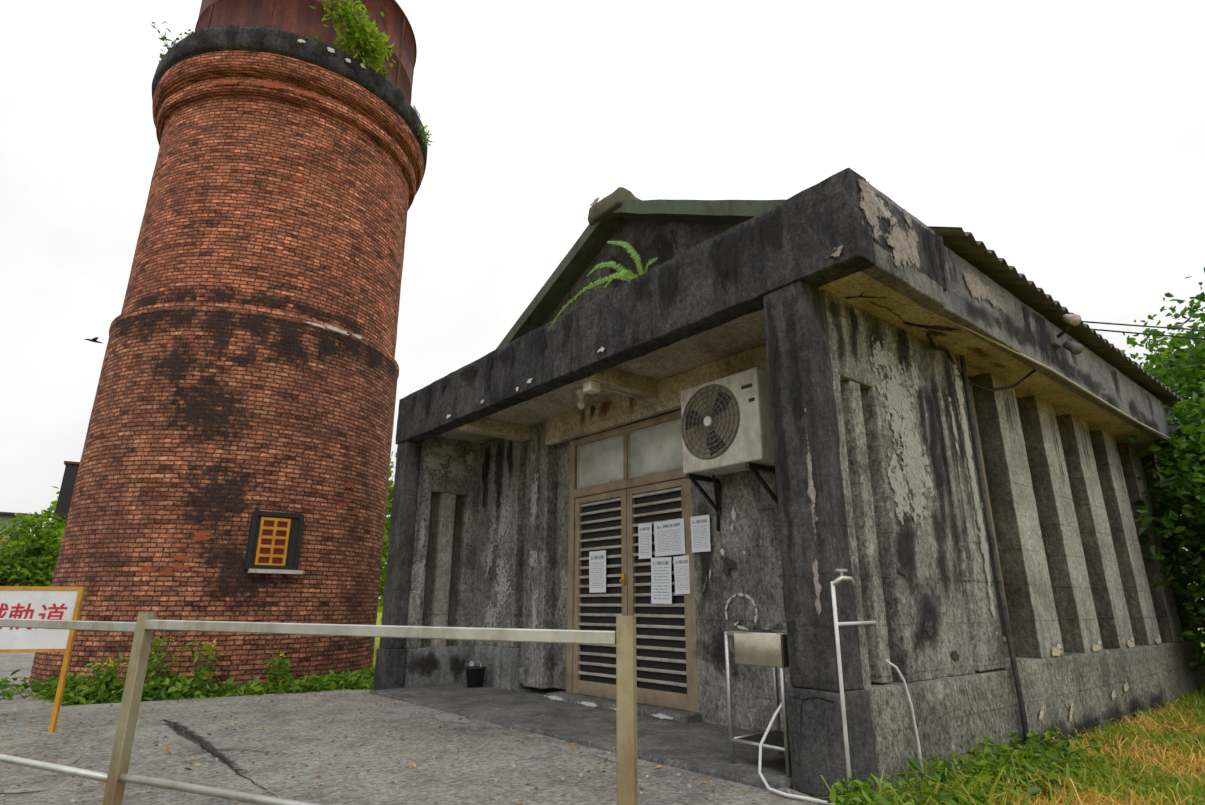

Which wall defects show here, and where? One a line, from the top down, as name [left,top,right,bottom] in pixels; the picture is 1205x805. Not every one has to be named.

water stain [607,230,680,309]
water stain [707,207,783,296]
water stain [411,327,545,414]
water stain [920,223,1160,435]
water stain [118,286,396,615]
water stain [481,440,513,531]
water stain [831,301,963,644]
water stain [413,652,466,679]
crack [163,719,277,797]